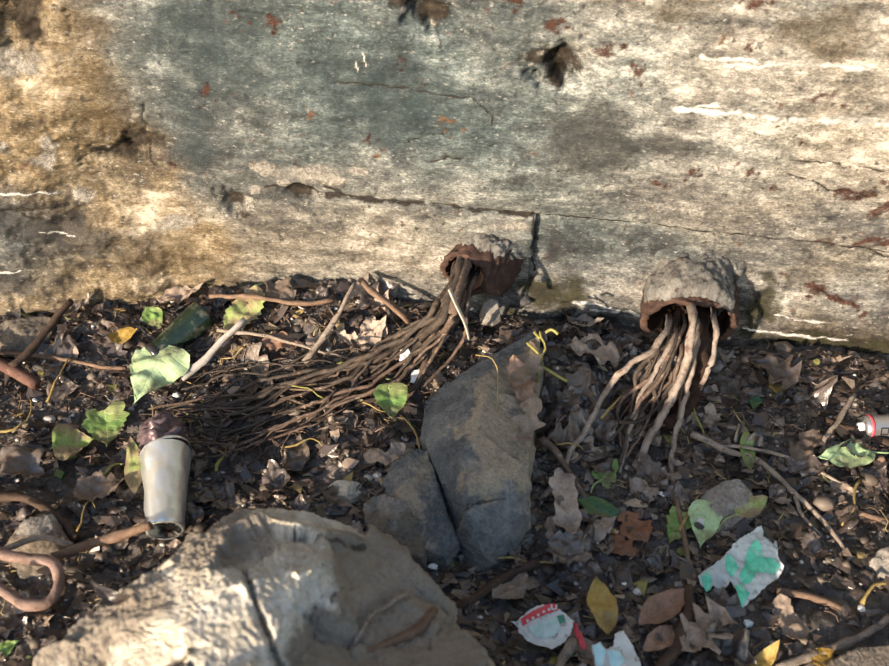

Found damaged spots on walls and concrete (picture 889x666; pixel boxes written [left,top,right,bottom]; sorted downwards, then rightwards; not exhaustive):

spalling [389,0,455,26]
spalling [519,42,596,88]
crack [264,160,889,271]
corrosion [833,180,889,218]
corrosion [800,282,866,318]